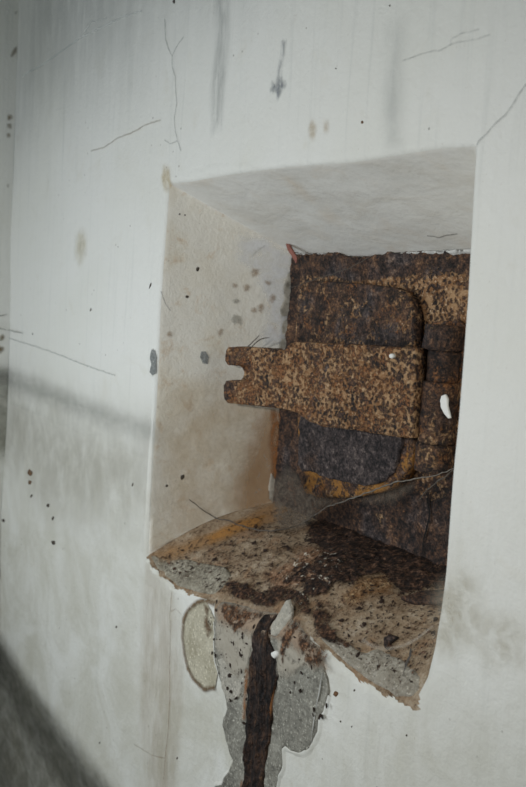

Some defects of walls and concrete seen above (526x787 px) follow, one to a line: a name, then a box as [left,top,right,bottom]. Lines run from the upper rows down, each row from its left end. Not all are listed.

flaking render [151,555,420,787]
corrosion [227,519,447,648]